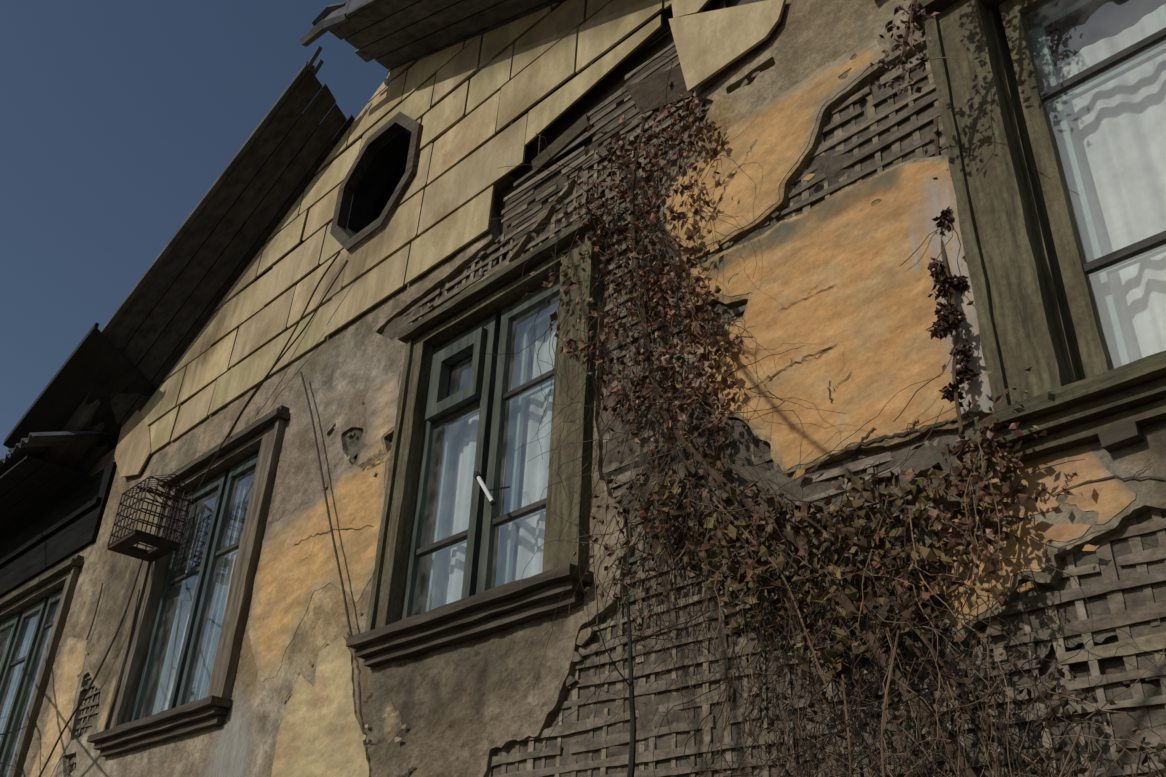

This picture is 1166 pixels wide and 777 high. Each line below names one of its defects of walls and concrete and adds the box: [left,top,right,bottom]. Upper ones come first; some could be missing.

crack [697,139,757,237]
crack [777,282,836,312]
crack [746,342,851,403]
flaking render [380,37,1166,777]
crack [808,409,984,473]
crack [293,518,373,560]
peeling [249,369,407,777]